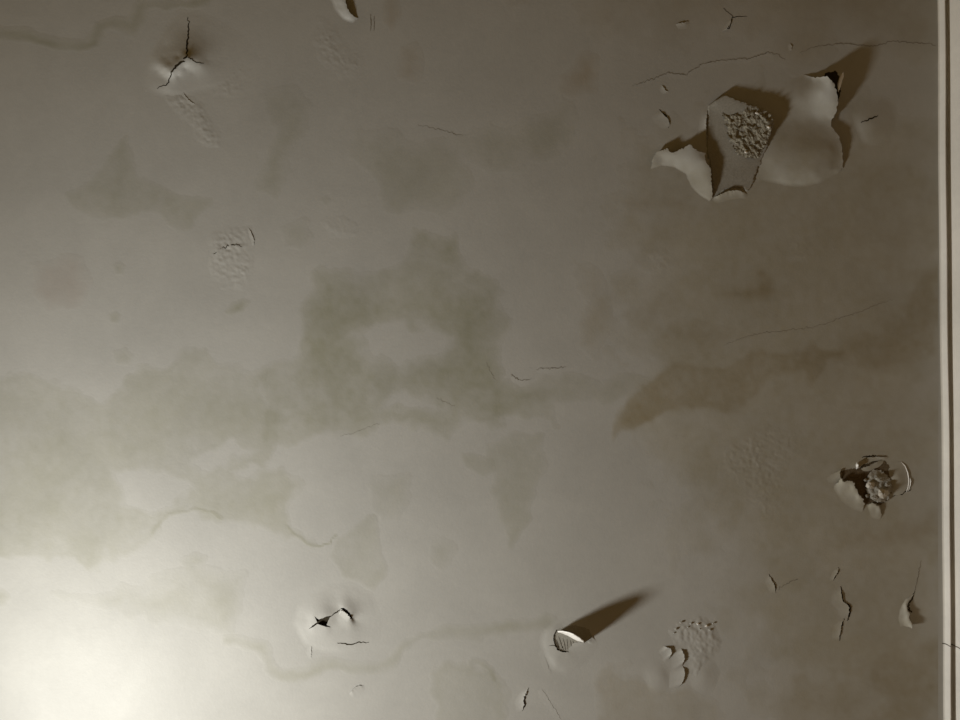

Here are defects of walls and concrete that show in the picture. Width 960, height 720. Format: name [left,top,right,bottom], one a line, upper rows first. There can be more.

peeling [330,0,358,23]
peeling [651,70,844,203]
water stain [0,227,649,592]
water stain [570,79,938,720]
spalling [827,455,911,519]
water stain [49,551,557,685]
crack [830,567,851,641]
peeling [898,564,921,629]